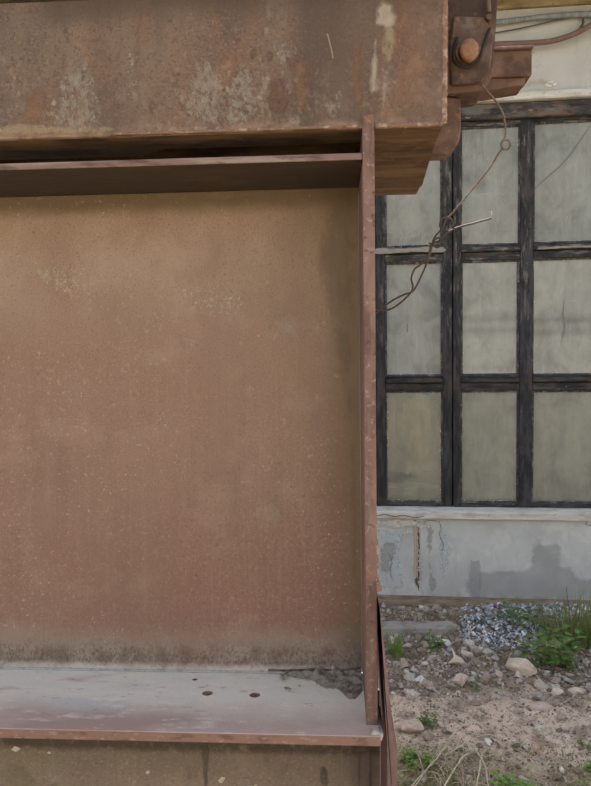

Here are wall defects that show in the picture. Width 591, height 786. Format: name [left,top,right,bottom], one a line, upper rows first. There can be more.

peeling [376,4,394,58]
peeling [186,64,257,124]
flaking render [376,514,434,593]